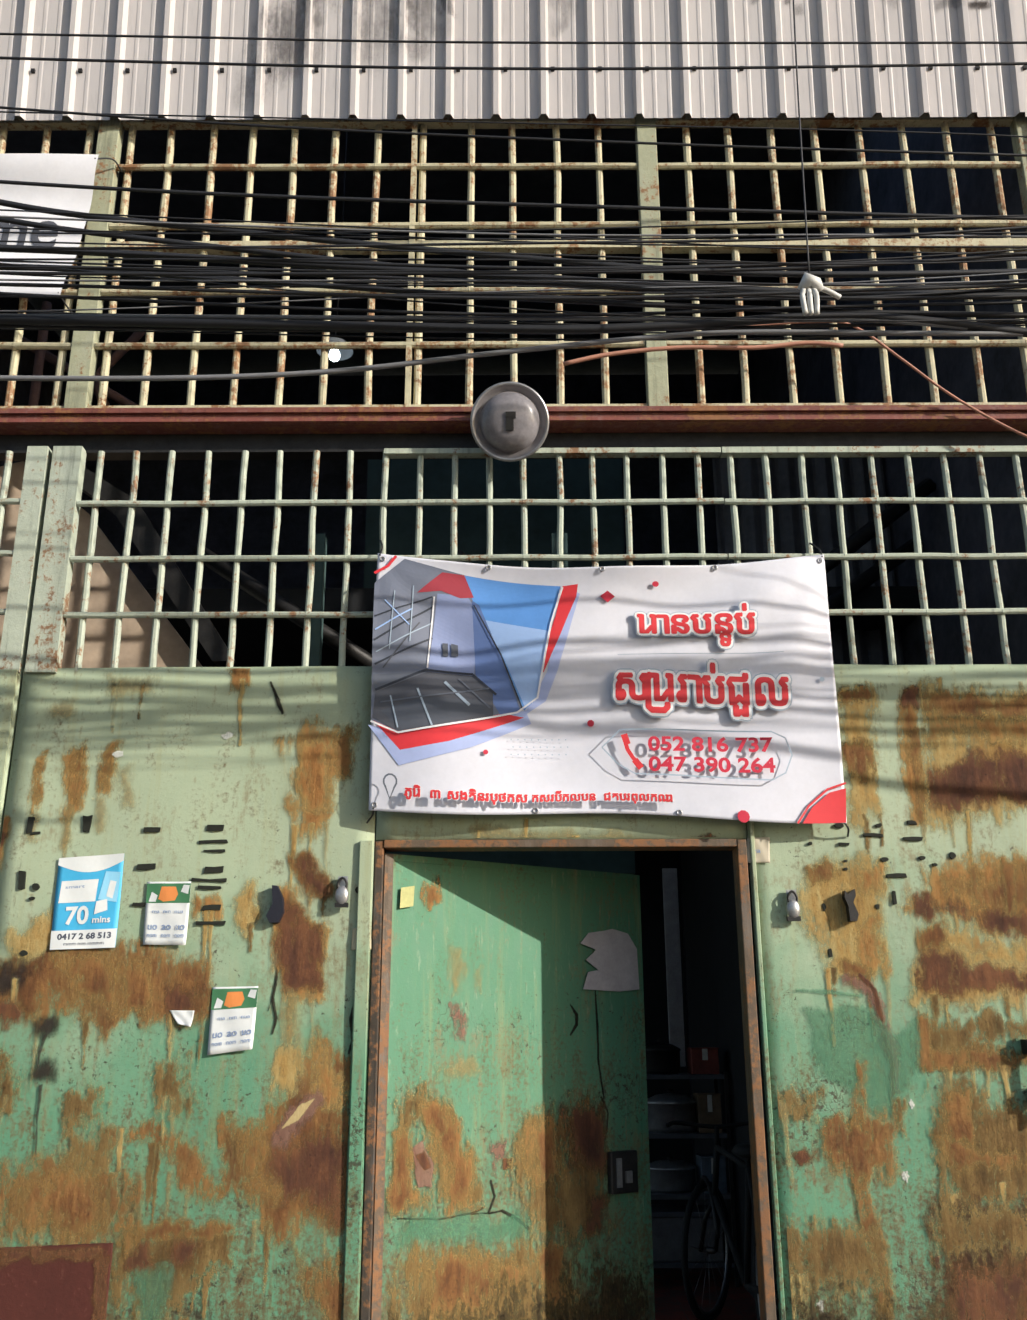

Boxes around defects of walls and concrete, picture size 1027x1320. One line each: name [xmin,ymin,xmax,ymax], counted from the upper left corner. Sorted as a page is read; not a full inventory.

rust [0,715,361,1320]
rust [229,668,251,746]
rust [777,677,1027,1320]